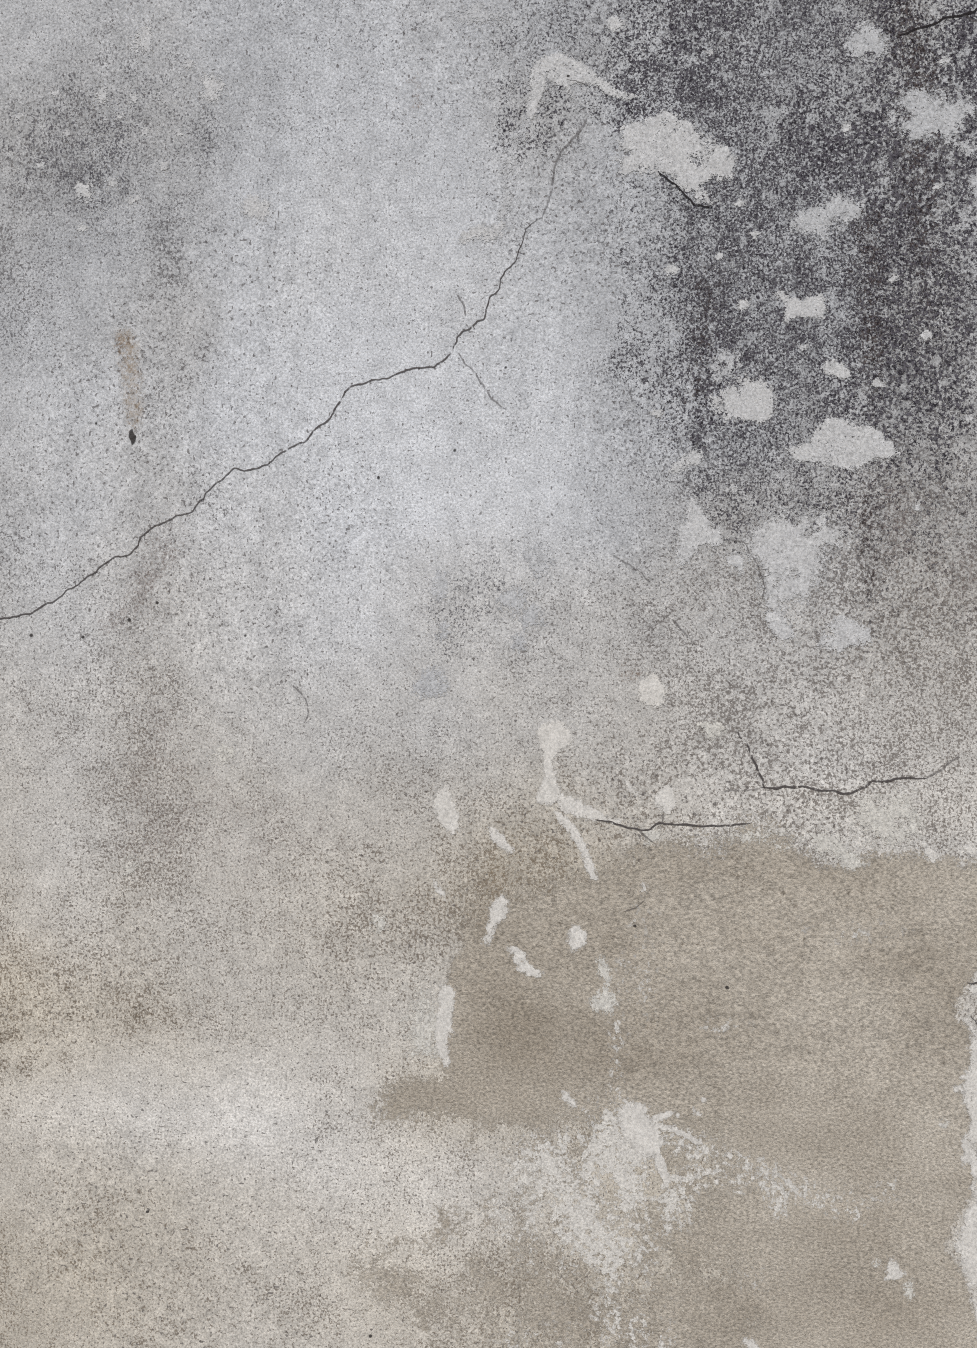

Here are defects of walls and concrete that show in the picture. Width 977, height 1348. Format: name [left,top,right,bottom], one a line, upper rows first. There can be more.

crack [0,217,542,619]
water stain [490,0,977,626]
peeling [624,780,677,814]
crack [595,819,750,831]
crack [737,732,924,795]
flaking render [347,784,977,1348]